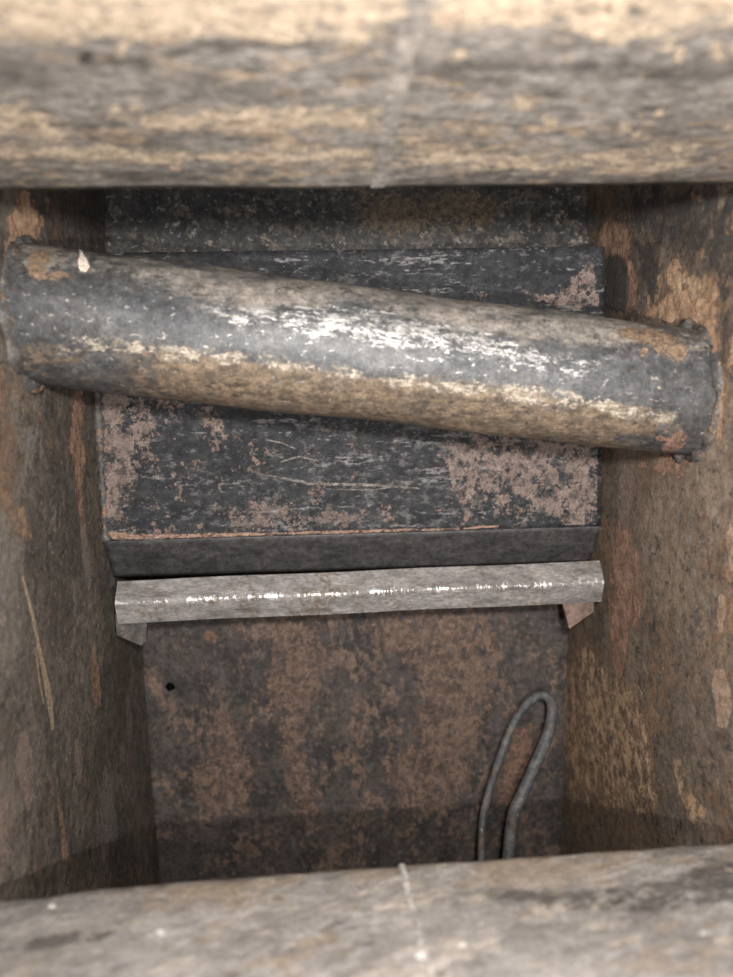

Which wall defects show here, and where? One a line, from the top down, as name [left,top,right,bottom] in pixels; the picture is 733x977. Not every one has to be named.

rust [189,615,335,820]
rust [359,609,508,816]
rust [496,723,534,806]